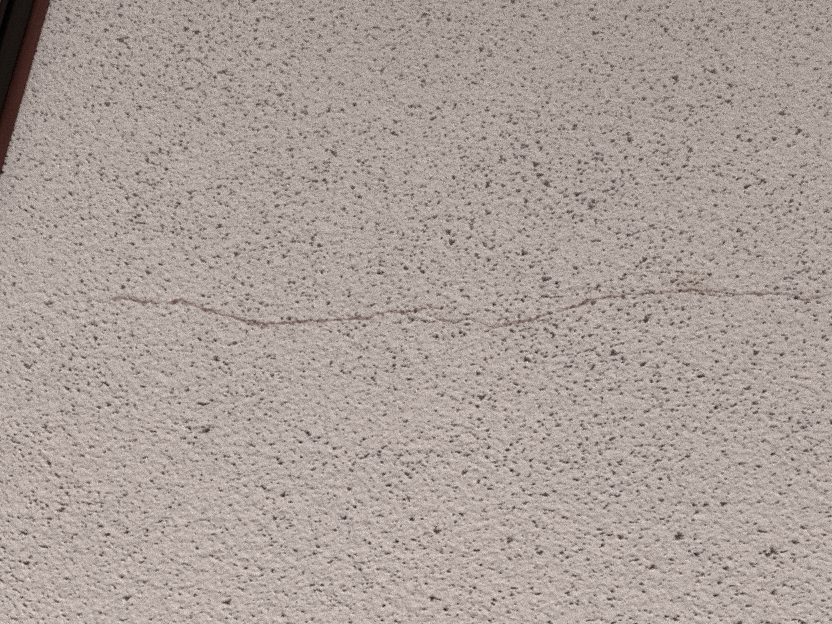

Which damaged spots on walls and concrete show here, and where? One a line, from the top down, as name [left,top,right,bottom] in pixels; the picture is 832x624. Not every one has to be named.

crack [87,289,832,329]